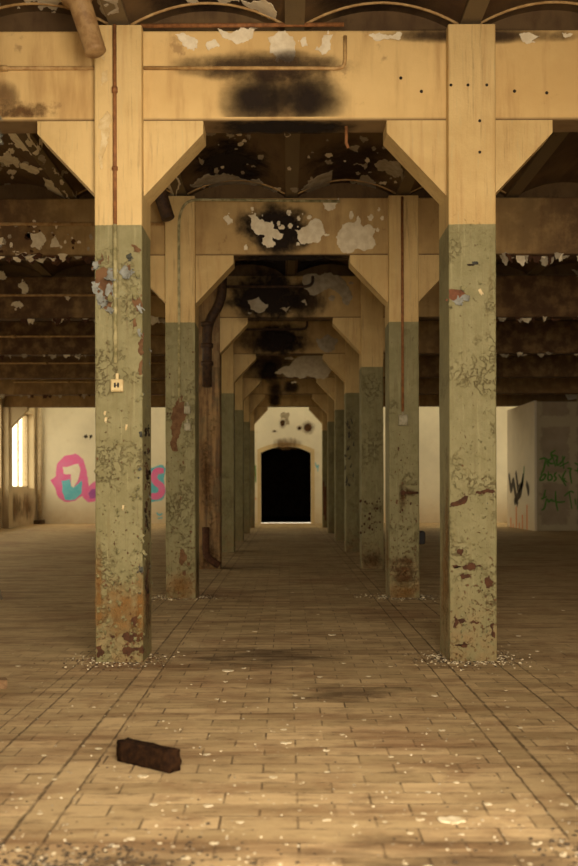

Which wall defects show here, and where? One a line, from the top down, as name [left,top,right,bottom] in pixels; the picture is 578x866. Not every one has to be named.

peeling [218,0,277,20]
peeling [175,27,256,51]
peeling [268,31,333,56]
peeling [369,32,402,41]
peeling [519,32,539,44]
damp [0,85,43,118]
peeling [167,153,333,196]
peeling [248,207,384,254]
spalling [499,252,578,277]
peeling [449,473,495,519]
peeling [94,423,154,661]
peeling [451,543,496,594]